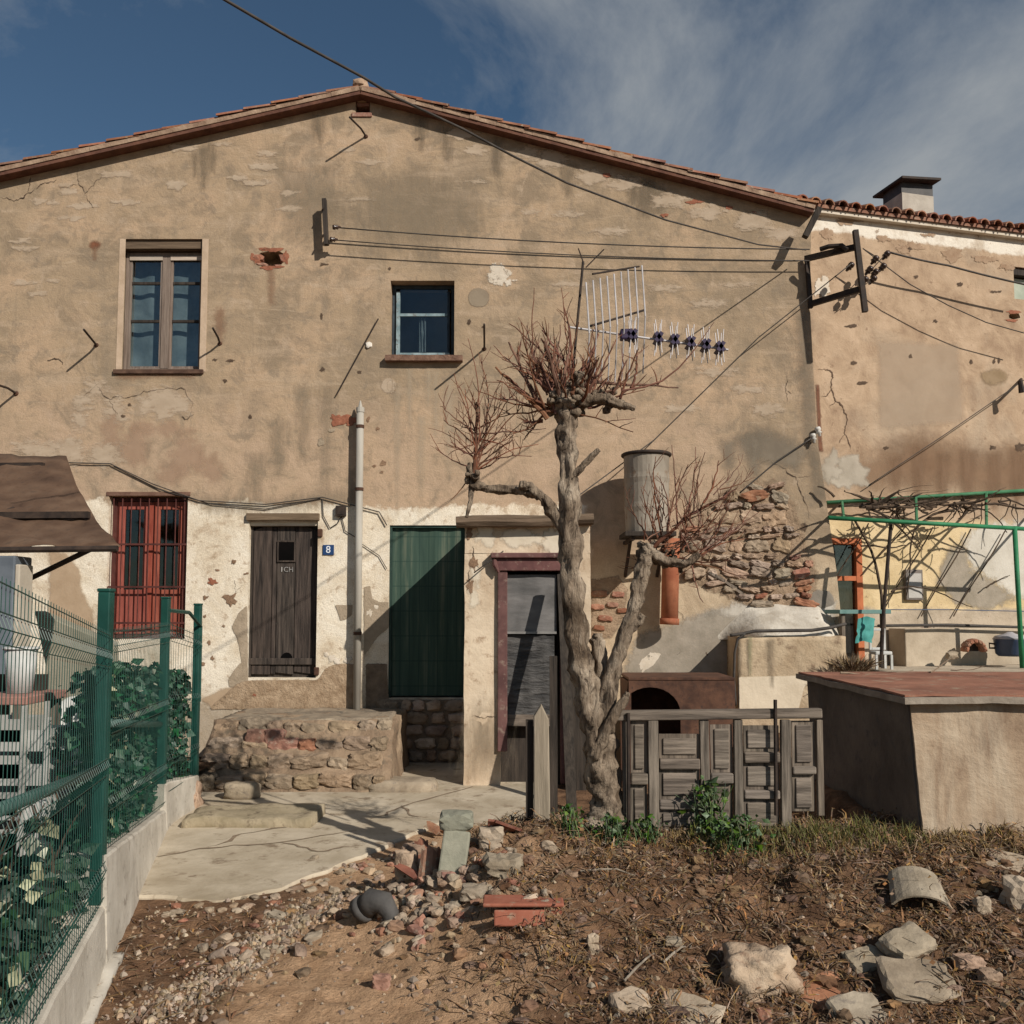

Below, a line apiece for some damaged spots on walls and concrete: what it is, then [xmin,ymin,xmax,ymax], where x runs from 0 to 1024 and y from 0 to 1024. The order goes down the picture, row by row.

crack [3,171,101,210]
spalling [250,247,289,270]
peeling [469,263,517,307]
spalling [330,414,380,430]
crack [821,369,851,448]
peeling [821,448,870,489]
water stain [863,440,1024,501]
spalling [591,576,628,638]
spalling [625,479,837,709]